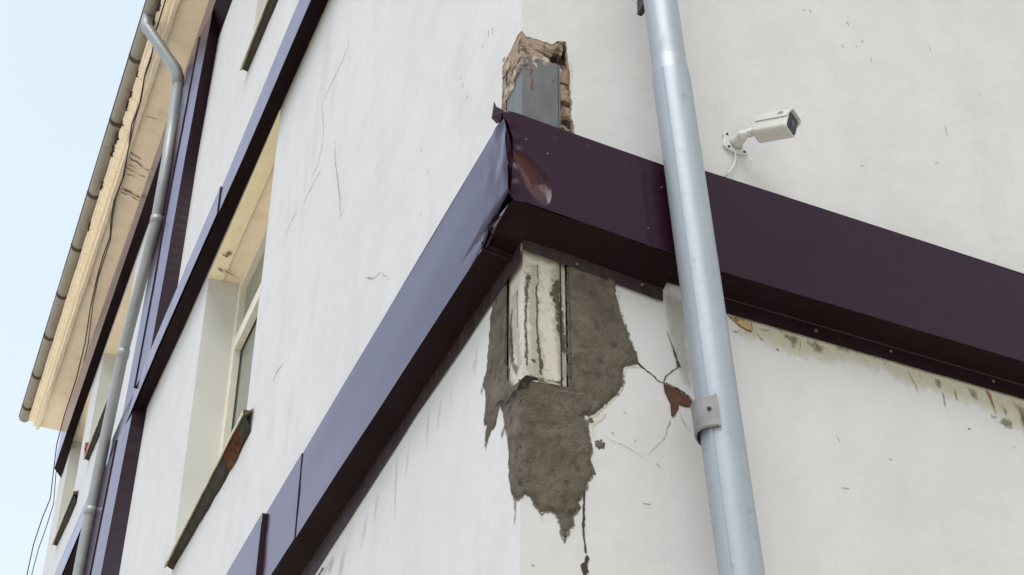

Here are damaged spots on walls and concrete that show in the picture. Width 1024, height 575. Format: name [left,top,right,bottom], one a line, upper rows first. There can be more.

spalling [501,31,575,134]
spalling [559,263,569,387]
crack [637,332,681,383]
water stain [745,318,841,356]
peeling [591,366,640,437]
spalling [664,382,693,417]
water stain [910,367,1024,426]